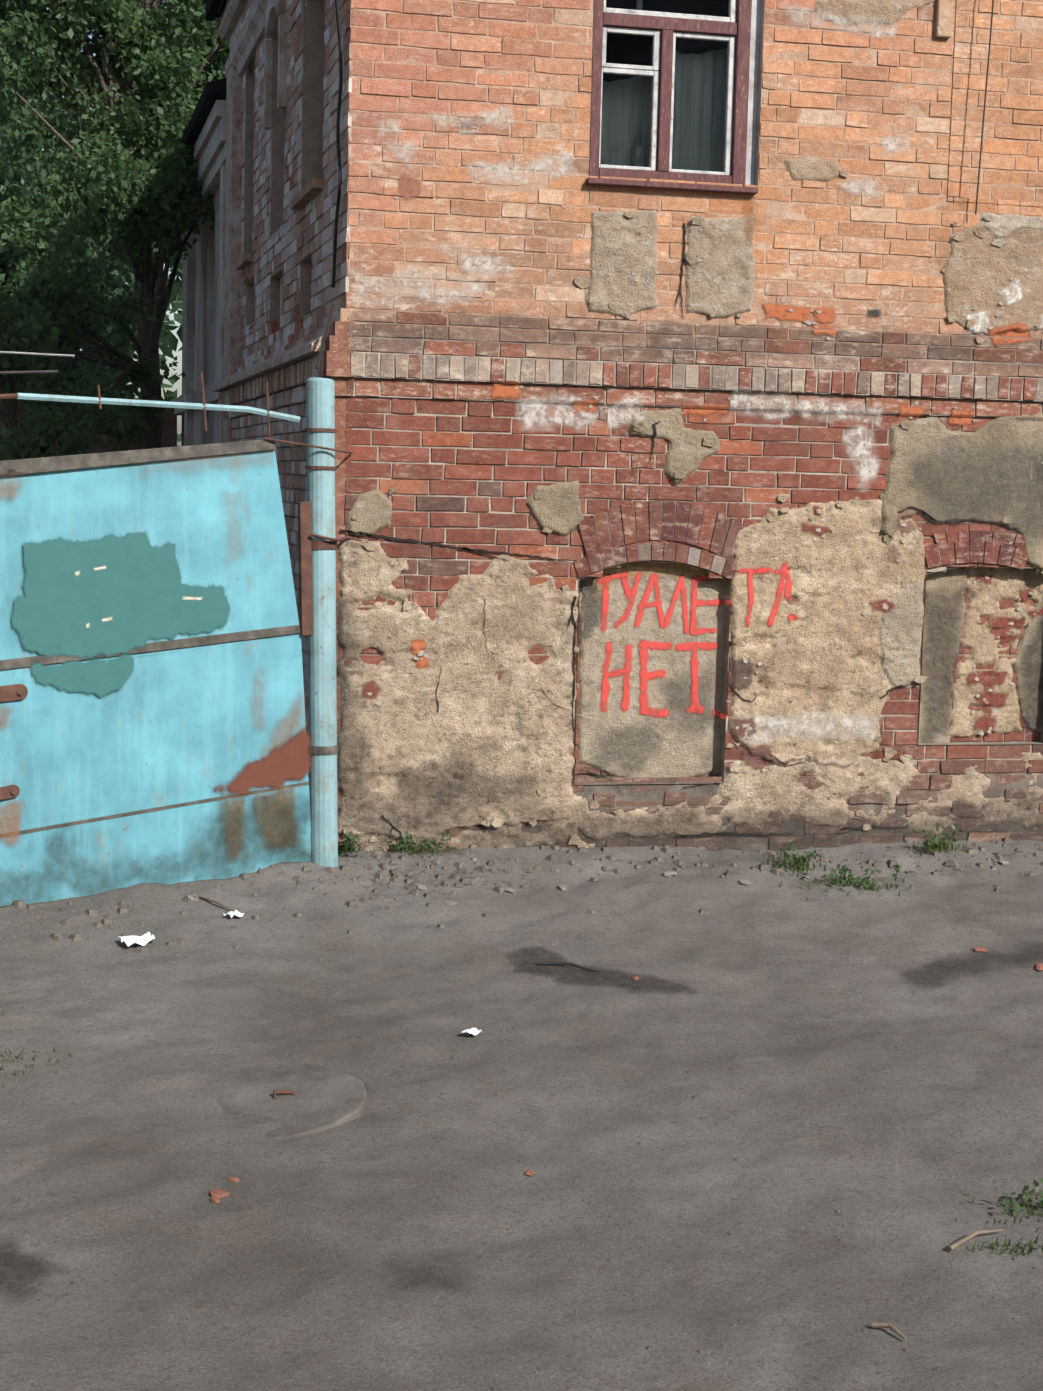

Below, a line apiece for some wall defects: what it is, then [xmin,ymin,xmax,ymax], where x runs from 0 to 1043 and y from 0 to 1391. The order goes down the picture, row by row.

crack [675,223,686,313]
spalling [492,376,524,398]
peeling [337,396,1043,852]
rust [214,722,312,857]